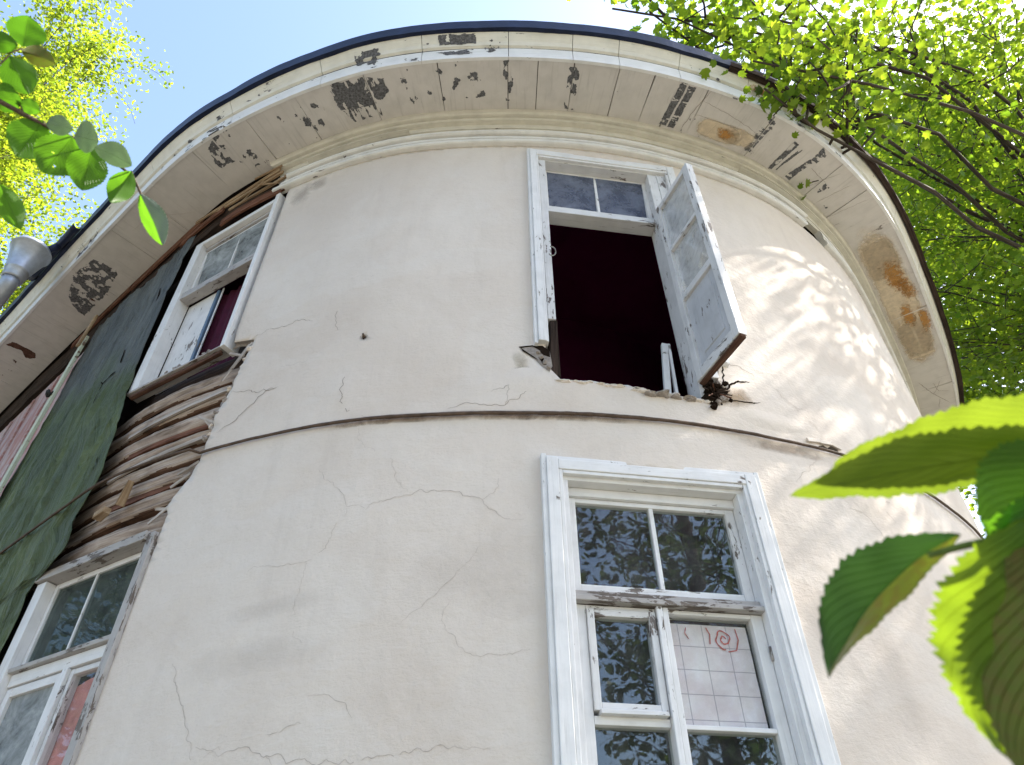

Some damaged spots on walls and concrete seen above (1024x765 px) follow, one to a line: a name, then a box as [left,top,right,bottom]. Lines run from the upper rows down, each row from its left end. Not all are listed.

peeling [330,48,389,122]
peeling [400,32,507,103]
peeling [503,60,513,101]
peeling [564,67,580,110]
peeling [659,82,696,130]
damp [698,120,753,147]
peeling [69,232,117,316]
damp [860,236,935,360]
peeling [2,342,36,376]
spalling [519,345,733,410]
crack [255,377,522,640]
crack [172,664,488,765]